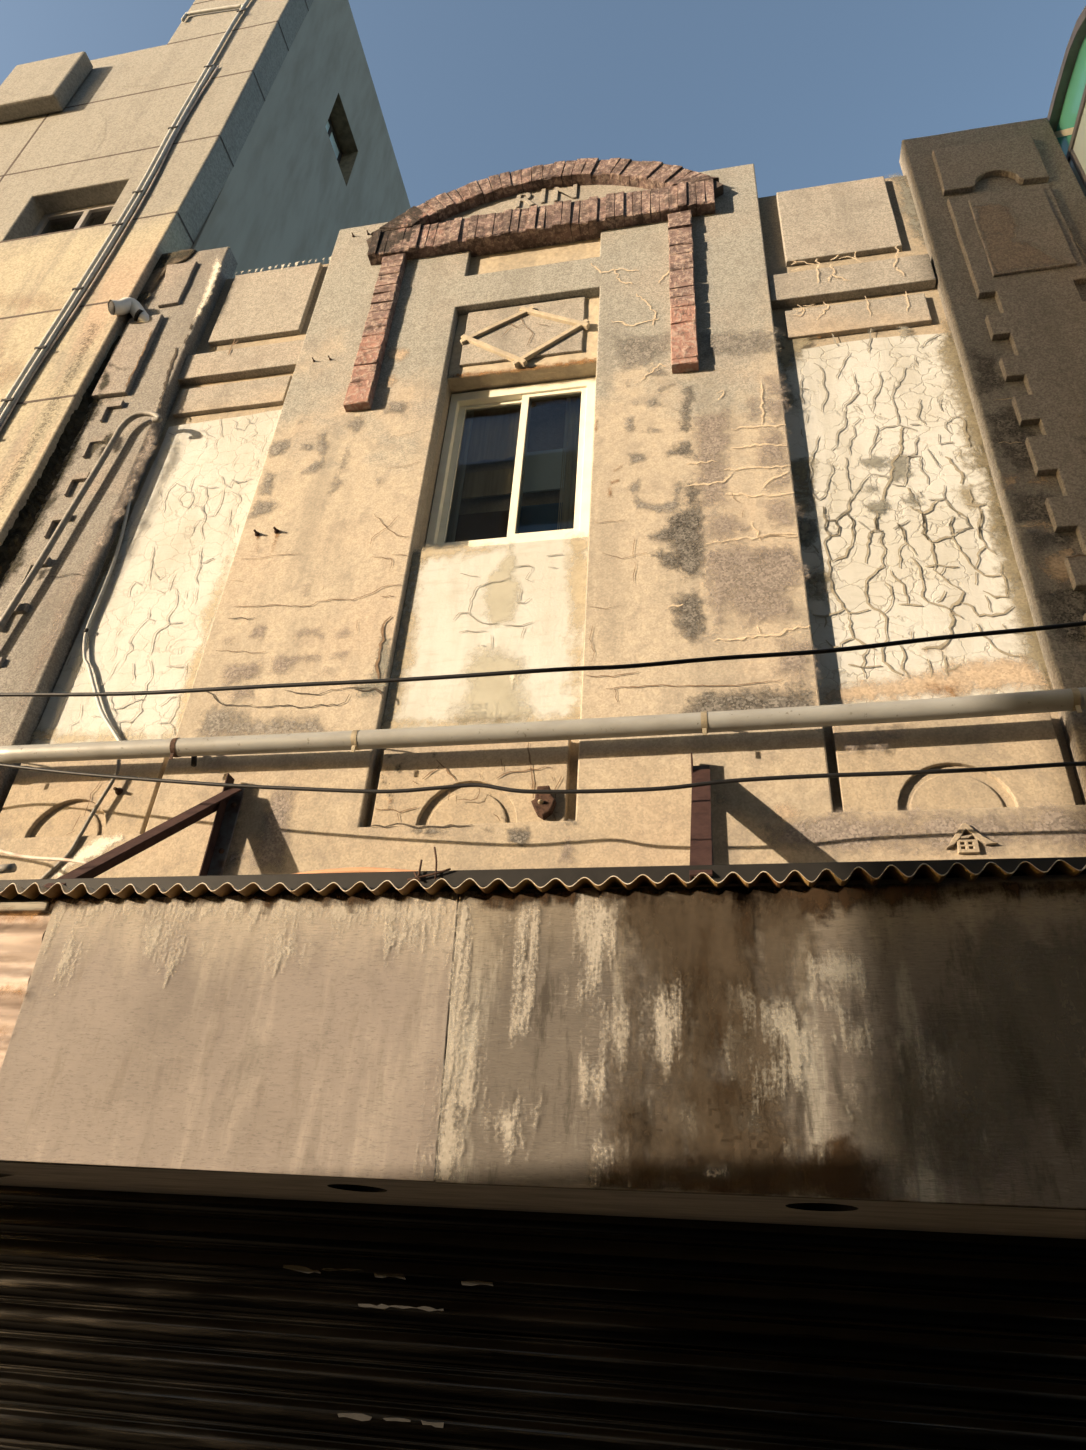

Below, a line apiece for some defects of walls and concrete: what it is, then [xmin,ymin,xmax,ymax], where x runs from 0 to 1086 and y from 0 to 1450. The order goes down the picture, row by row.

leakage [0,336,121,587]
crack [44,324,409,735]
crack [453,554,563,649]
crack [591,263,669,326]
crack [586,520,783,702]
leakage [777,336,810,405]
leakage [791,458,817,547]
crack [684,245,1052,679]
leakage [860,455,912,514]
leakage [939,323,1052,690]
crack [369,742,562,828]
leakage [46,880,1086,1200]